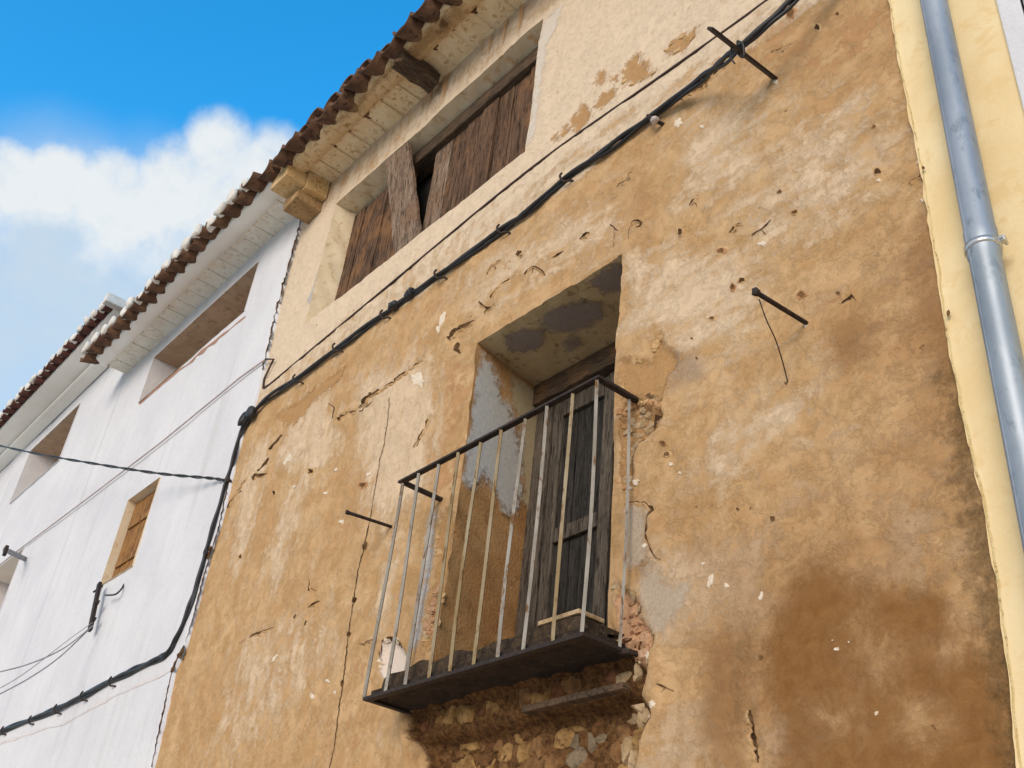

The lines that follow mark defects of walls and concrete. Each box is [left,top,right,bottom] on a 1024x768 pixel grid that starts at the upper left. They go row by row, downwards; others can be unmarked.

flaking render [551,52,659,141]
flaking render [664,27,696,56]
peeling [462,351,526,516]
crack [328,358,425,766]
flaking render [377,506,455,678]
flaking render [407,580,656,768]
crack [624,501,661,560]
crack [743,710,759,763]
leakage [770,393,1016,768]